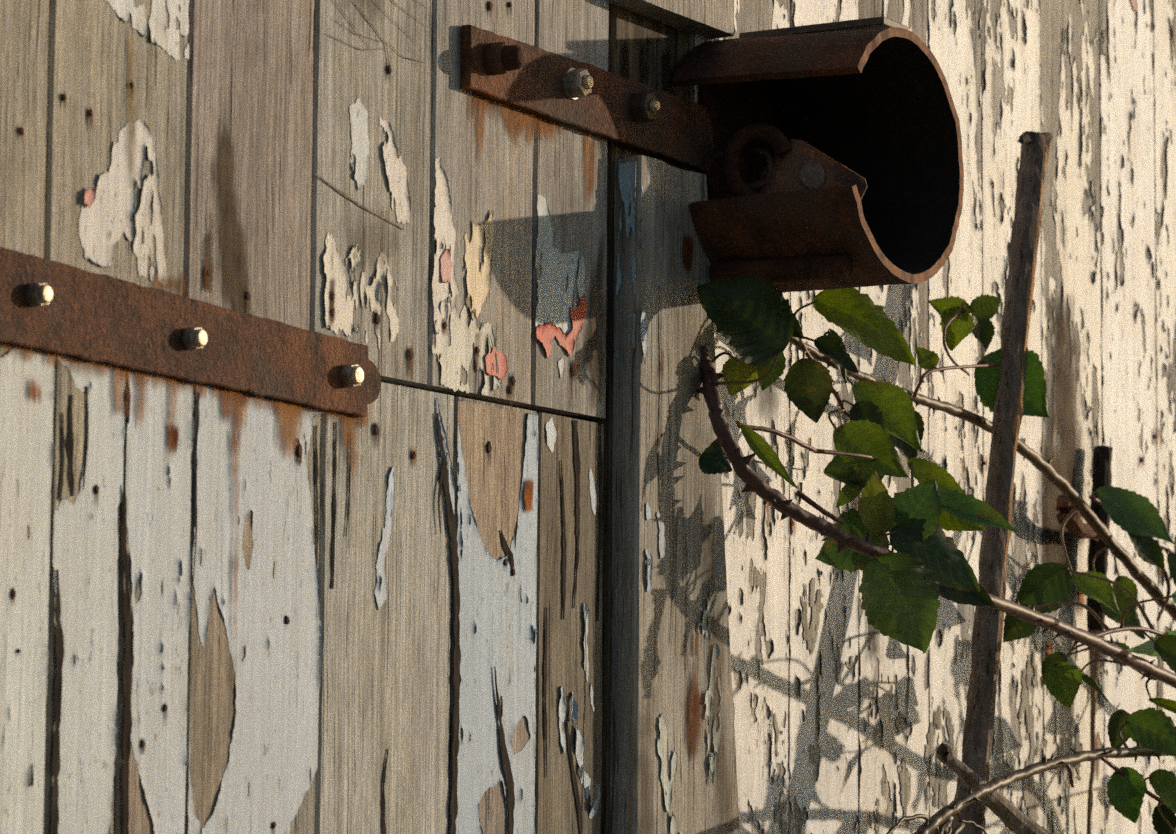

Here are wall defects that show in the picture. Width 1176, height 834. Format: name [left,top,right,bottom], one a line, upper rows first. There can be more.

peeling [105,0,189,61]
peeling [78,119,168,285]
peeling [323,233,399,349]
peeling [349,98,411,224]
corrosion [470,92,558,157]
peeling [535,194,585,335]
corrosion [586,136,596,196]
corrosion [3,343,380,516]
peeling [432,157,556,834]
peeling [695,0,1176,834]
peeling [0,346,323,834]
peeling [558,602,600,819]